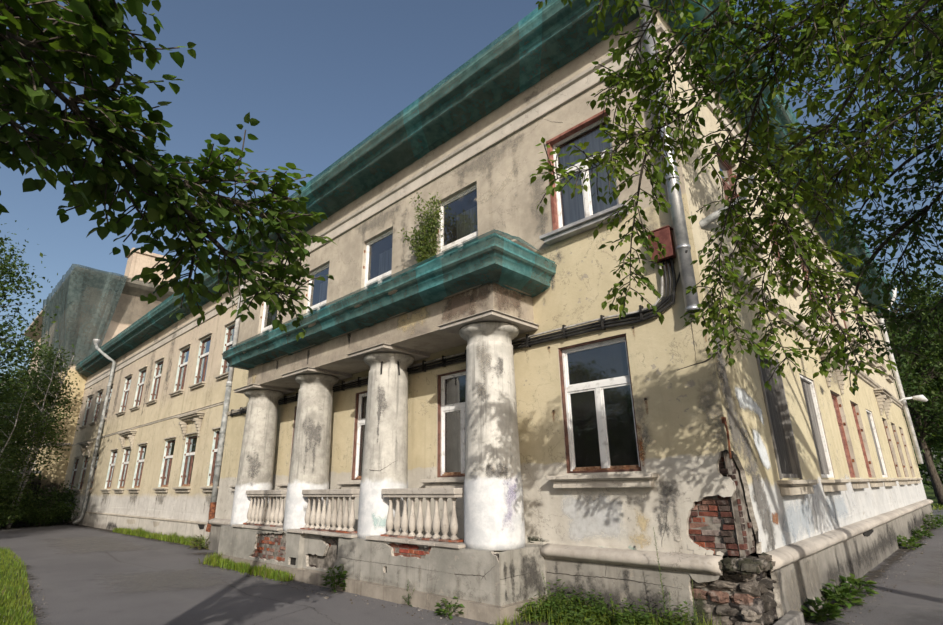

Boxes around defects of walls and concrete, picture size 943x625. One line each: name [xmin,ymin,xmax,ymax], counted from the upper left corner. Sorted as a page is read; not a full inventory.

water stain [303,422,321,471]
water stain [702,323,775,550]
spalling [251,533,286,562]
spalling [308,536,339,569]
spalling [389,543,432,560]
water stain [658,485,680,535]
spalling [687,450,778,625]
water stain [786,501,811,536]
water stain [504,557,543,598]
water stain [556,566,668,625]